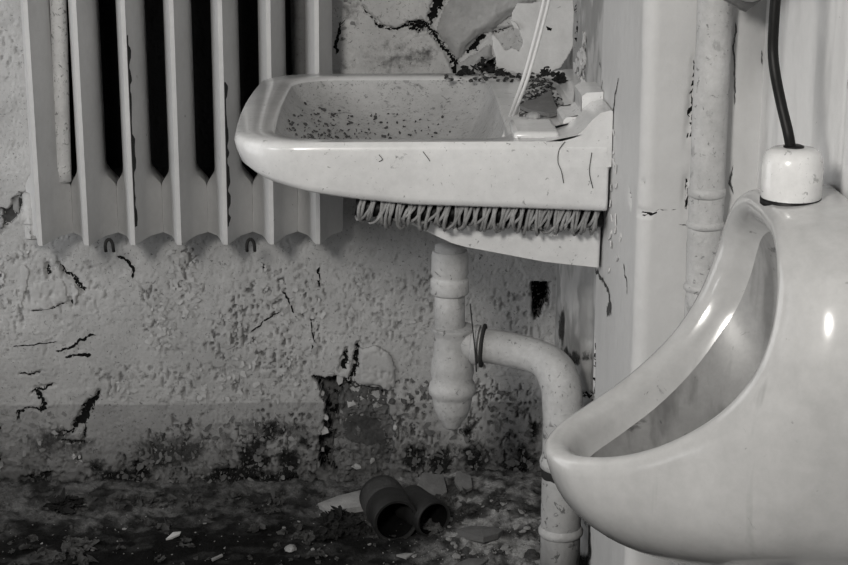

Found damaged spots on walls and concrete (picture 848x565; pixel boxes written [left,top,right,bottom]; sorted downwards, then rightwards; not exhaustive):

crack [333,20,345,54]
crack [362,0,509,73]
flaking render [0,191,23,229]
crack [32,263,86,311]
spalling [526,276,555,321]
crack [13,333,95,358]
crack [336,342,360,382]
crack [0,371,53,429]
crack [63,390,100,444]
crack [29,471,51,483]